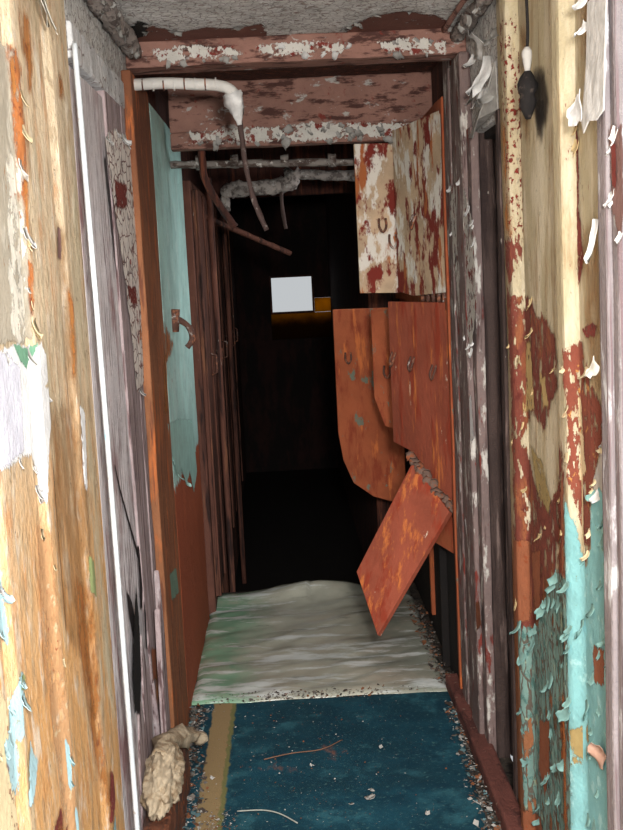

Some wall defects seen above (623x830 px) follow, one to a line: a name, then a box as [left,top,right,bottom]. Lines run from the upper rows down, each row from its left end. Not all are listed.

rust [6,14,33,234]
peeling [189,121,407,151]
peeling [566,0,608,133]
rust [571,124,584,284]
peeling [0,42,53,504]
rust [582,323,597,338]
peeling [168,418,197,489]
peeling [0,572,15,645]
peeling [170,569,179,600]
peeling [505,233,608,830]
peeling [0,672,38,830]